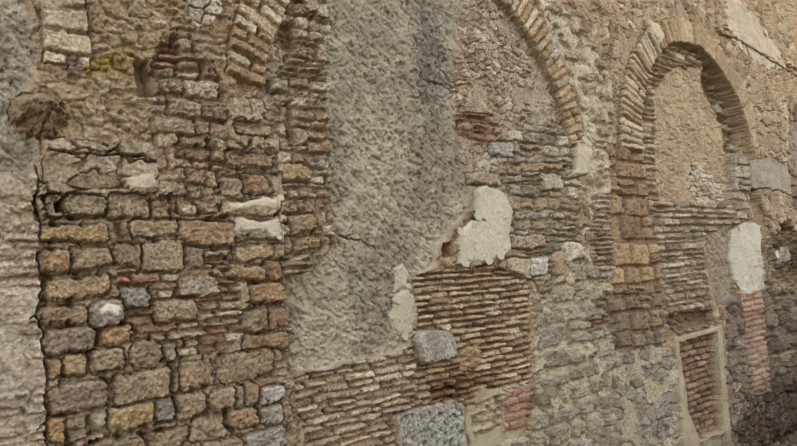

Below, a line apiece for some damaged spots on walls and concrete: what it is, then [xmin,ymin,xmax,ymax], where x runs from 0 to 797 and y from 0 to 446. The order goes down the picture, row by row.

flaking render [456,185,513,267]